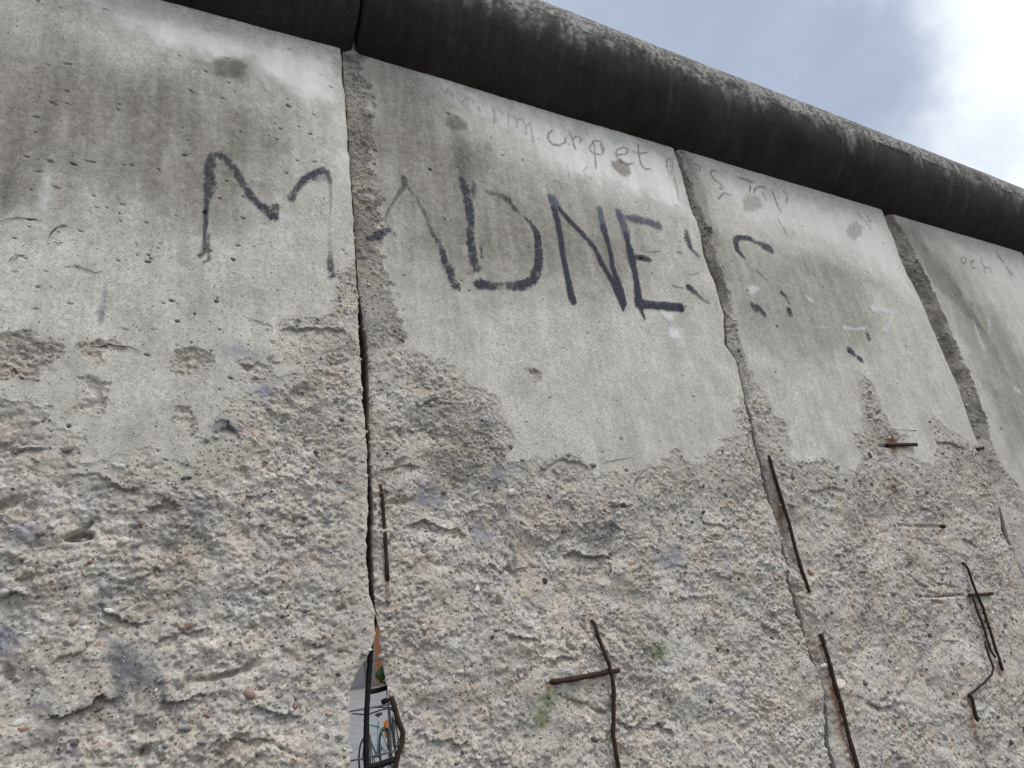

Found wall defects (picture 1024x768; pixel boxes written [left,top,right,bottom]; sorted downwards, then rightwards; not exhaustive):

spalling [0,51,408,768]
spalling [365,150,1024,768]